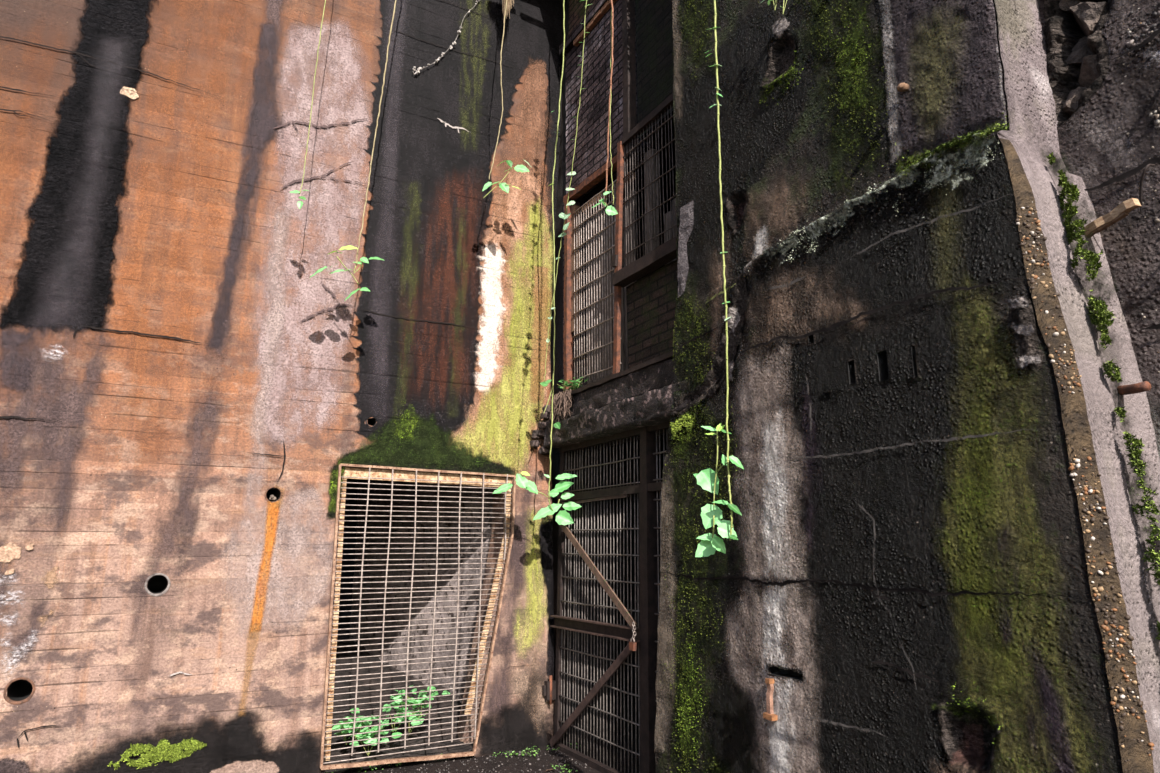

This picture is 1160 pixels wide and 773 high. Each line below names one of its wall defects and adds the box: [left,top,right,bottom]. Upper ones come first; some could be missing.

spalling [1043,0,1160,124]
damp [0,0,159,530]
damp [210,0,563,472]
spalling [1118,105,1160,239]
damp [0,562,43,663]
damp [151,391,218,575]
rust [250,501,279,632]
damp [654,485,675,749]
damp [672,0,1024,773]
crack [659,498,1080,686]
crack [781,374,1041,458]
spalling [933,684,1003,773]